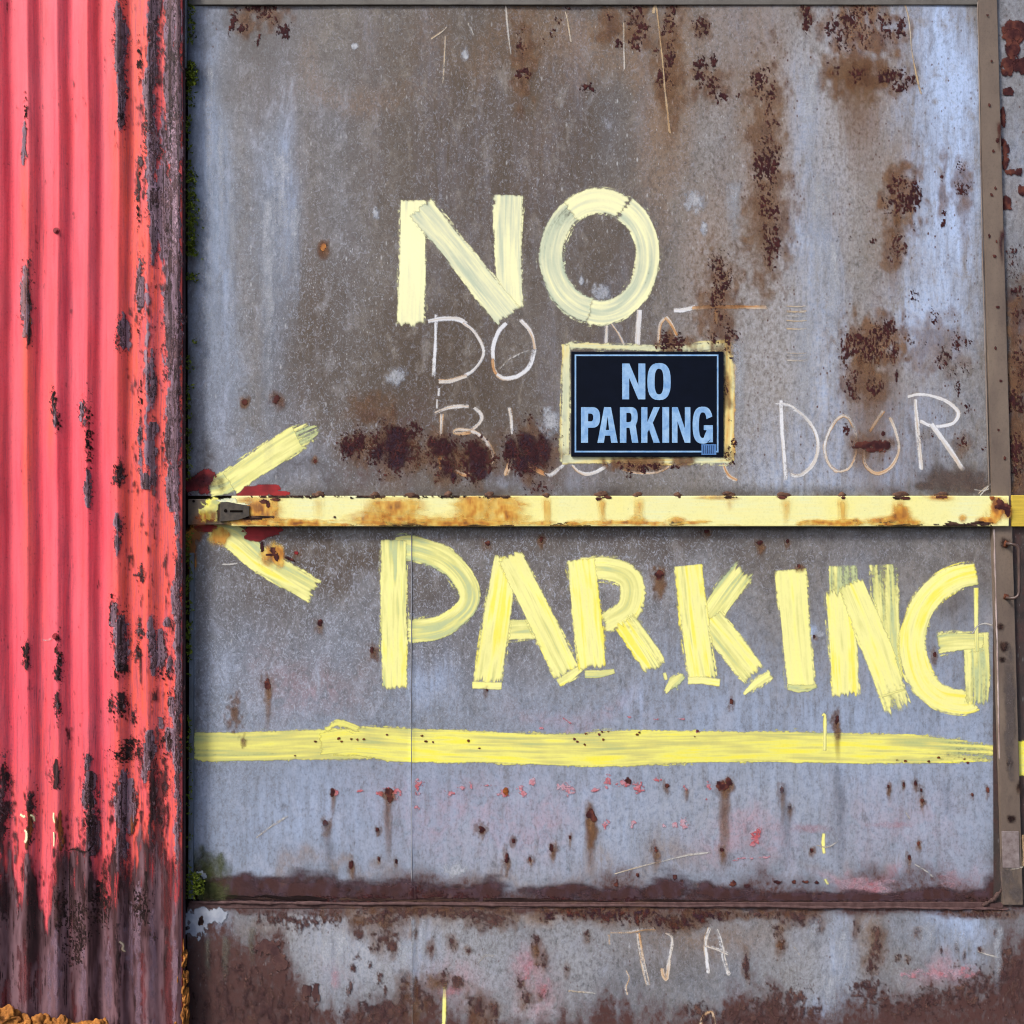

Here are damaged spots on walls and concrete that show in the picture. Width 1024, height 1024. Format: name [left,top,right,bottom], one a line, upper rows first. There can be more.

rust [800,5,917,102]
rust [597,5,789,285]
rust [988,19,1024,210]
peeling [16,259,36,348]
rust [831,311,972,414]
peeling [77,382,94,525]
rust [335,408,563,547]
peeling [21,639,31,670]
peeling [52,627,64,728]
peeling [0,751,40,854]
peeling [53,810,65,851]
rust [518,873,1008,950]